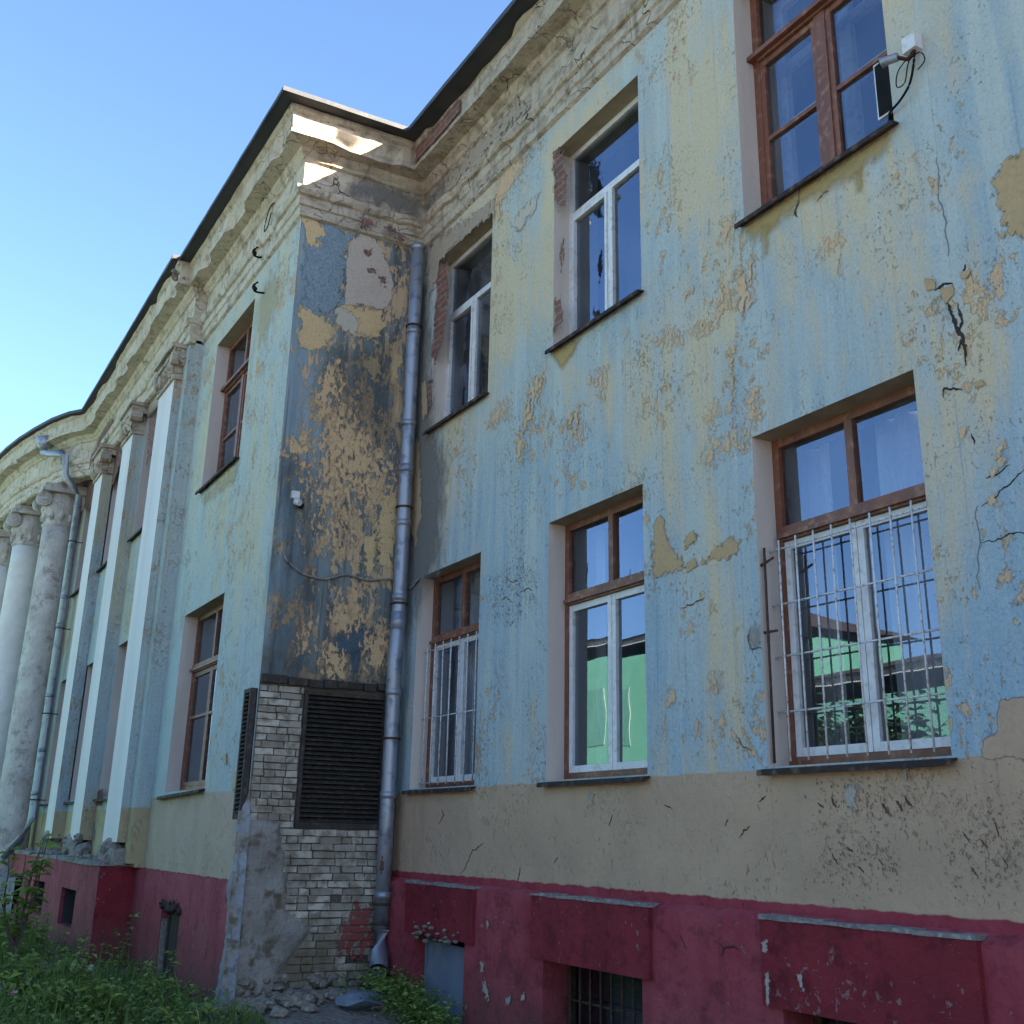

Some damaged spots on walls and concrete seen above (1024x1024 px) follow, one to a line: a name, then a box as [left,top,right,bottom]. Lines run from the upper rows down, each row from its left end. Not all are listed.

flaking render [551,147,568,207]
peeling [990,148,1024,239]
flaking render [425,154,539,365]
flaking render [553,295,563,332]
peeling [652,250,758,357]
crack [924,160,985,398]
peeling [268,217,406,680]
peeling [484,365,546,468]
peeling [700,340,765,470]
peeling [650,515,741,579]
crack [958,425,1024,588]